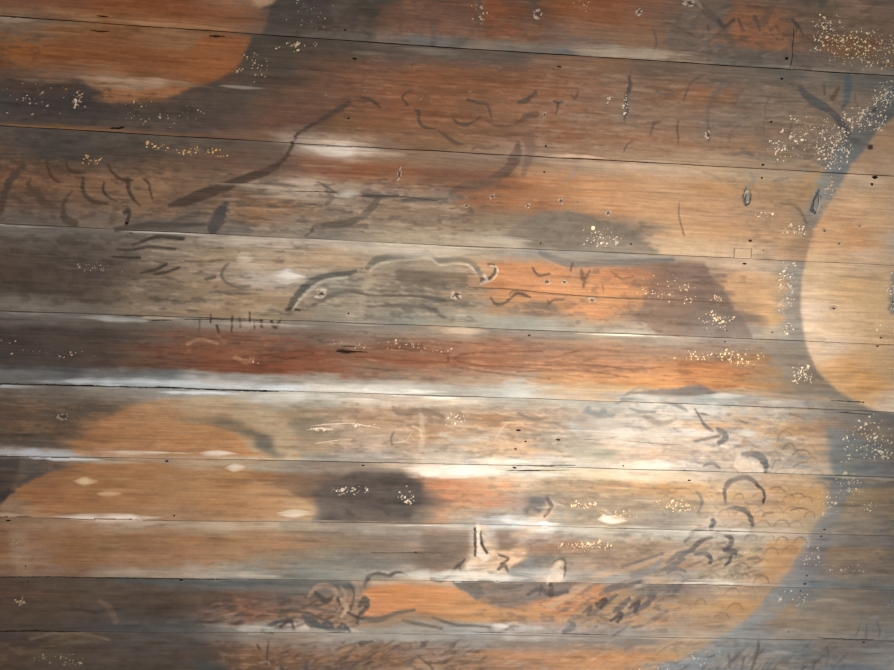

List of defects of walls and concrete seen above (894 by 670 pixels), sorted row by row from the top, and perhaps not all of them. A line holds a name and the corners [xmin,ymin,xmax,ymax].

water stain [548,427,767,447]
water stain [0,446,316,472]
water stain [329,456,726,480]
water stain [72,476,151,498]
water stain [44,508,812,539]